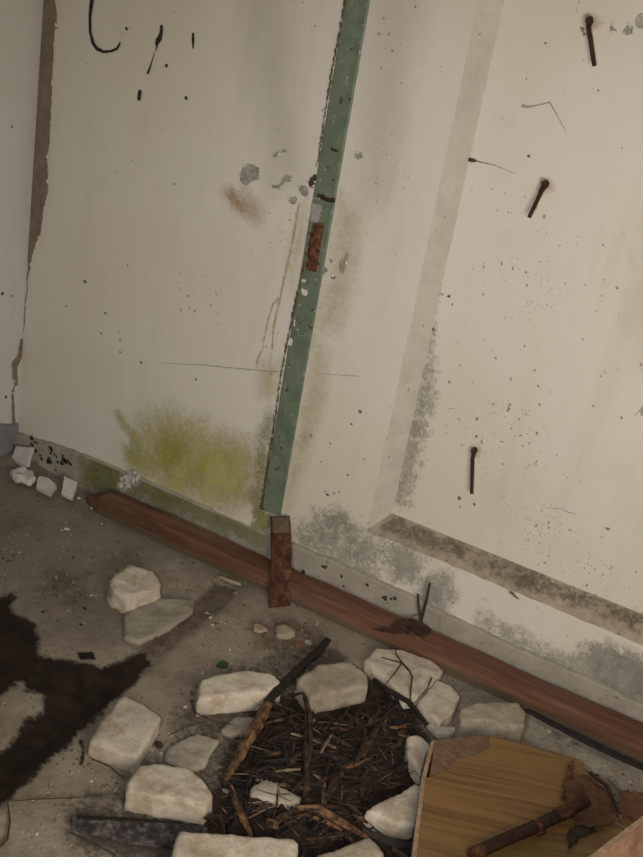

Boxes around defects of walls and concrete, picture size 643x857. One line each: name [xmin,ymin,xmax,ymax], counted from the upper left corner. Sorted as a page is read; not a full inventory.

flaking render [27,0,58,267]
flaking render [11,339,23,424]
damp [295,509,468,611]
damp [491,562,592,603]
damp [478,612,643,703]